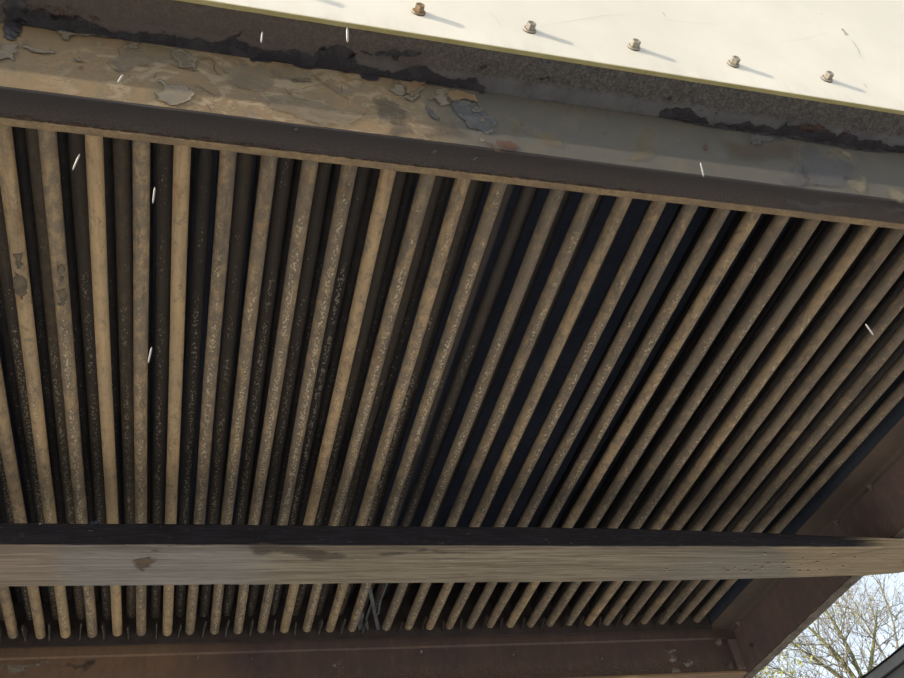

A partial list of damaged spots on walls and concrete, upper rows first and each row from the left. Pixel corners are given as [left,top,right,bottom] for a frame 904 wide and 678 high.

peeling [154,79,195,105]
peeling [390,81,478,120]